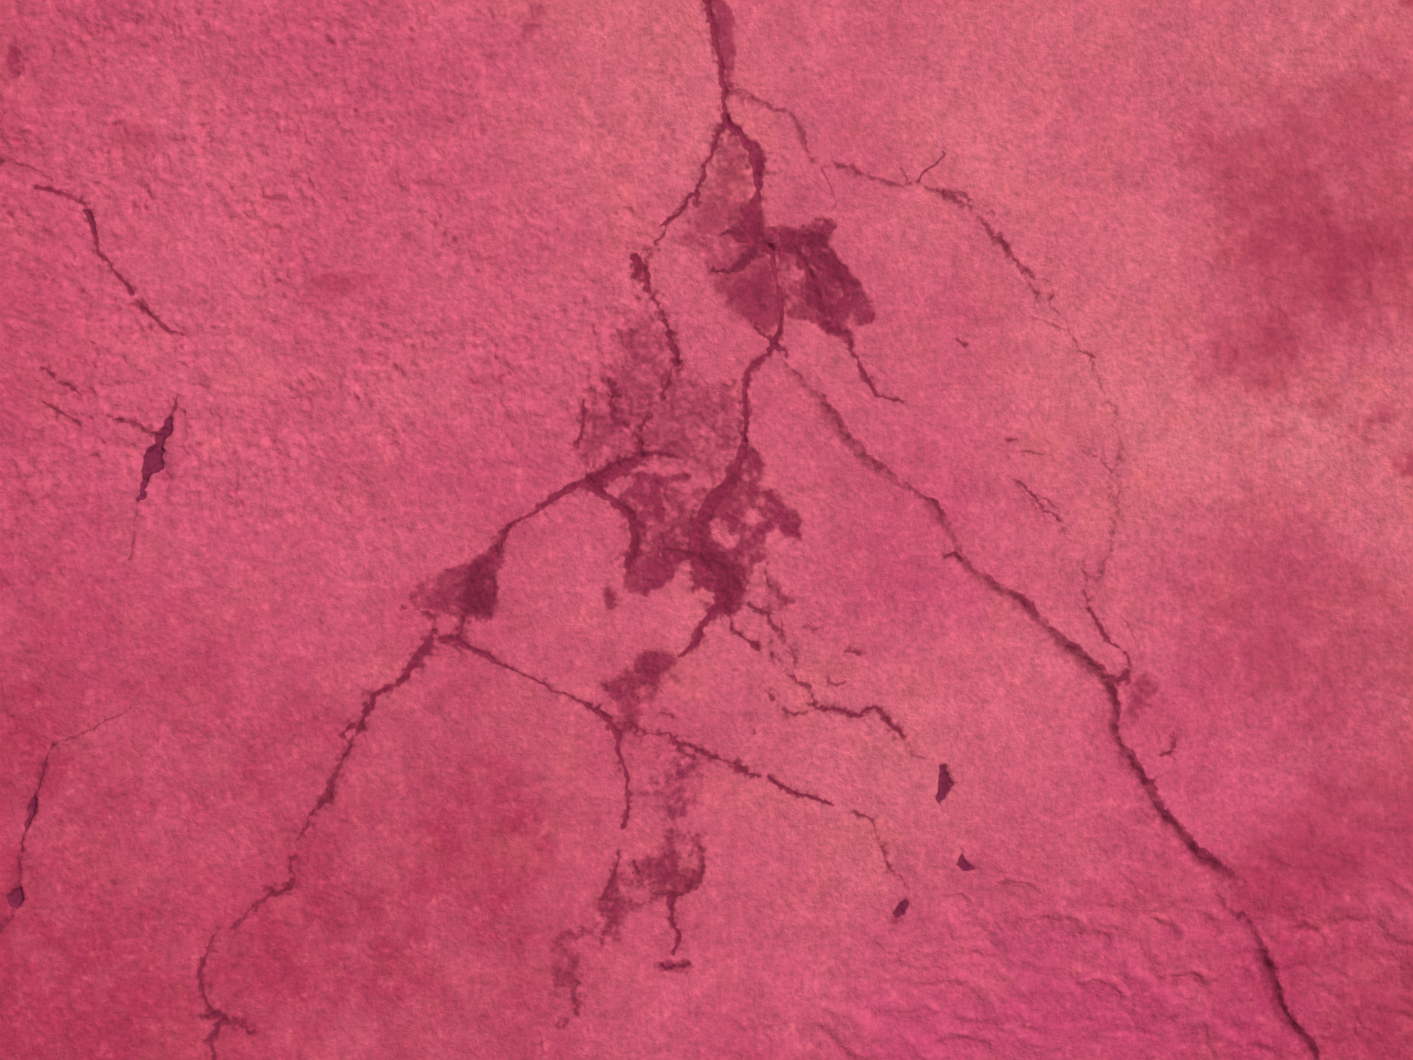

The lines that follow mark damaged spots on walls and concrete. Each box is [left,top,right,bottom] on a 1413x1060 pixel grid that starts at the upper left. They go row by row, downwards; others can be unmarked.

crack [34,185,184,335]
crack [630,0,946,657]
spalling [766,219,875,347]
crack [490,441,645,555]
spalling [574,330,801,631]
spalling [401,551,502,636]
crack [0,742,54,932]
crack [340,628,909,901]
spalling [601,652,676,727]
spalling [768,673,817,716]
crack [944,548,1240,877]
crack [658,892,689,971]